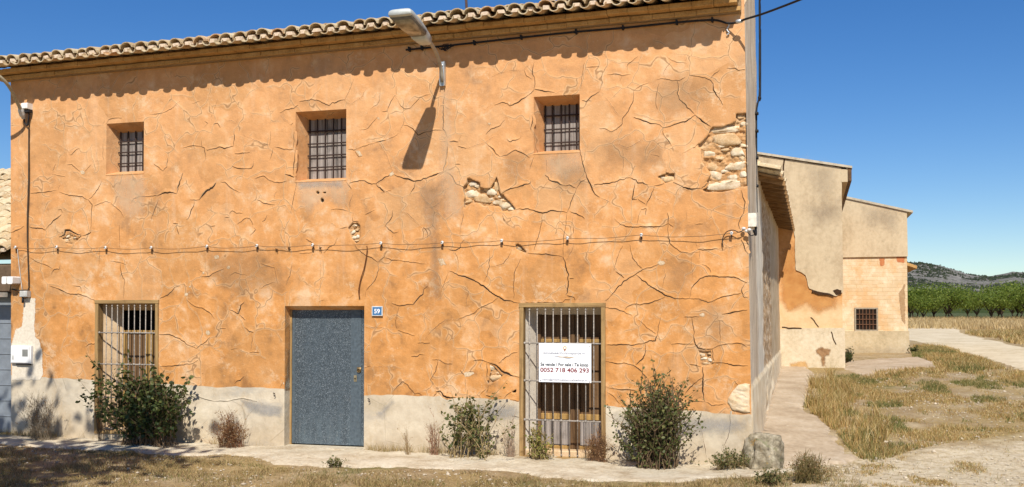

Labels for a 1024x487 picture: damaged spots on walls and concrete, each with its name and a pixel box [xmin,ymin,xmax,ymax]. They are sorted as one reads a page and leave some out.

spalling [698,114,748,192]
spalling [464,179,515,212]
spalling [349,223,360,243]
crack [10,49,751,458]
peeling [782,248,841,311]